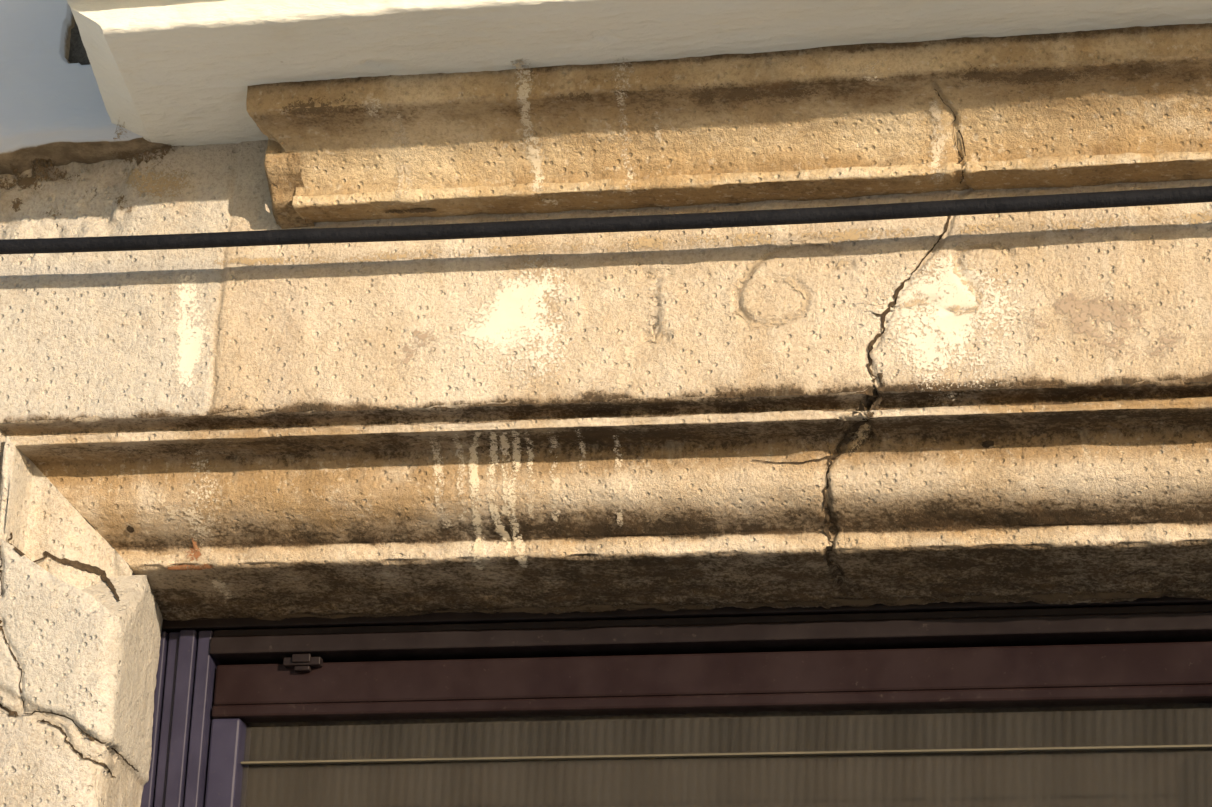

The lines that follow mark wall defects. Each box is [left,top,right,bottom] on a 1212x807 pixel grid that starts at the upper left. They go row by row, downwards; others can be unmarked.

leakage [280,94,437,214]
leakage [512,58,559,205]
leakage [611,56,636,195]
leakage [665,82,819,102]
crack [934,89,966,184]
leakage [960,59,1168,85]
crack [752,216,951,578]
leakage [429,429,535,570]
leakage [545,431,561,520]
leakage [613,435,624,525]
crack [0,546,139,778]